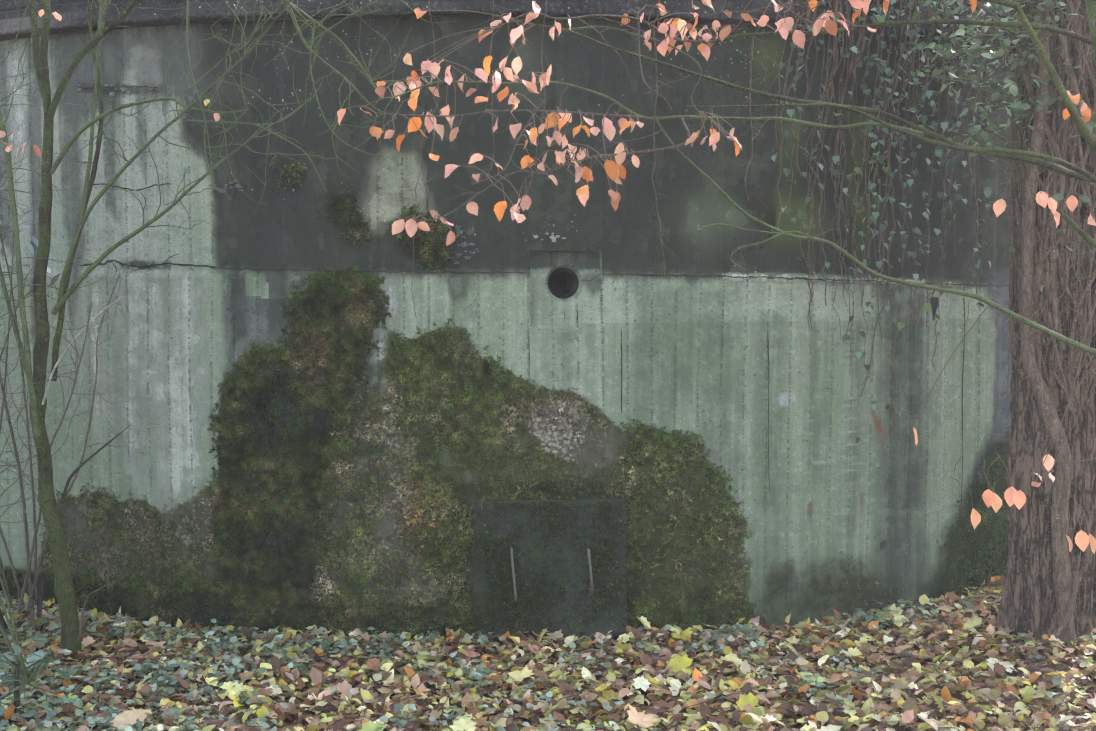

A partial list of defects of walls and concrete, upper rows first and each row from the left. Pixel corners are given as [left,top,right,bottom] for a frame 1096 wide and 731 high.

leakage [0,45,42,339]
crack [80,253,548,284]
leakage [50,17,1014,600]